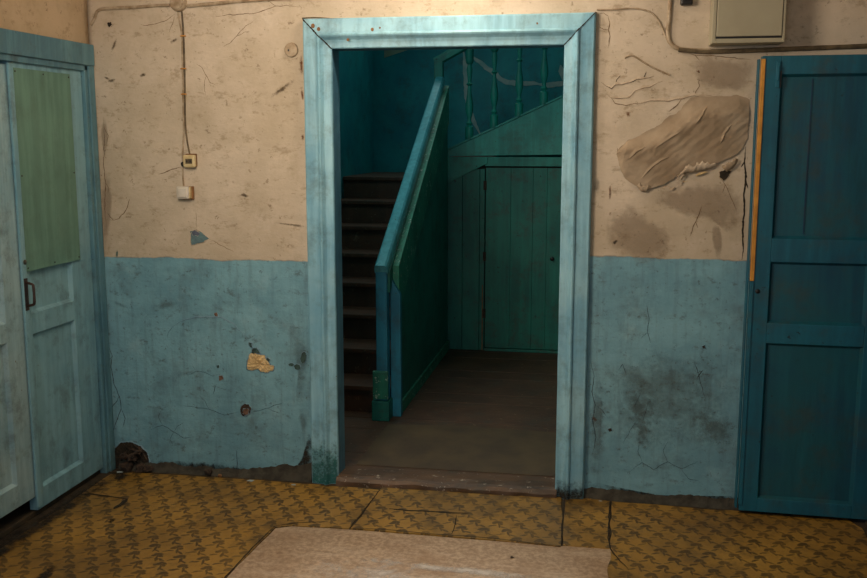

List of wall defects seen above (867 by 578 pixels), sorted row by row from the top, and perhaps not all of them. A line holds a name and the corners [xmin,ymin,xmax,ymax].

crack [601,73,720,111]
crack [722,147,748,257]
peeling [190,229,210,246]
flaking render [246,341,275,373]
peeling [240,403,252,417]
hole [115,441,154,473]